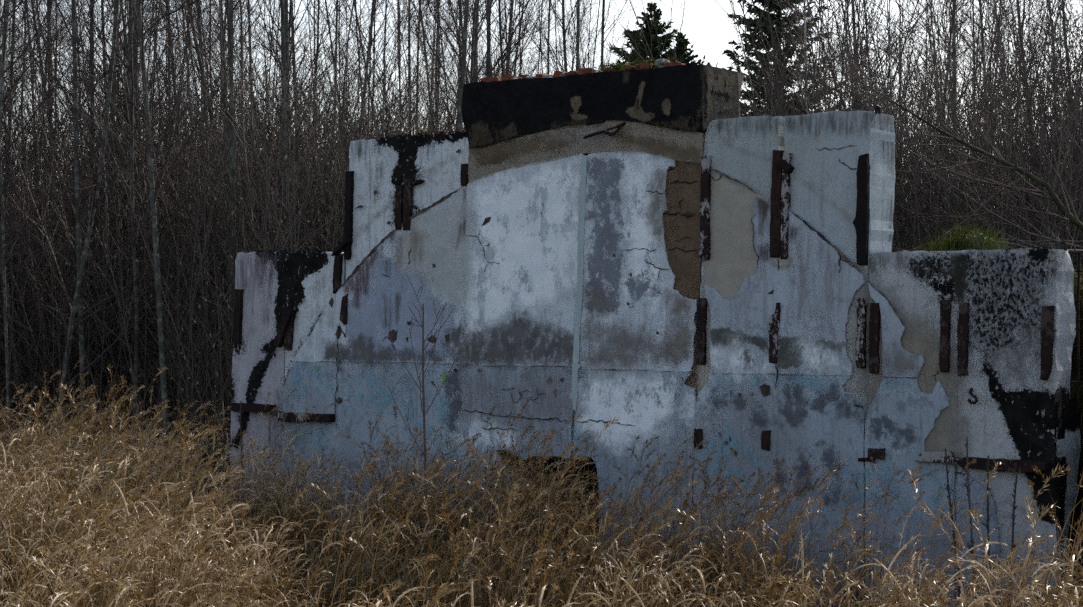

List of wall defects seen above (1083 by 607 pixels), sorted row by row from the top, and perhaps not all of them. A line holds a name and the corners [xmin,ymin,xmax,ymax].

damp [228,248,328,449]
peeling [335,120,771,575]
damp [710,327,918,447]
flaking render [798,264,963,464]
damp [897,241,1082,531]